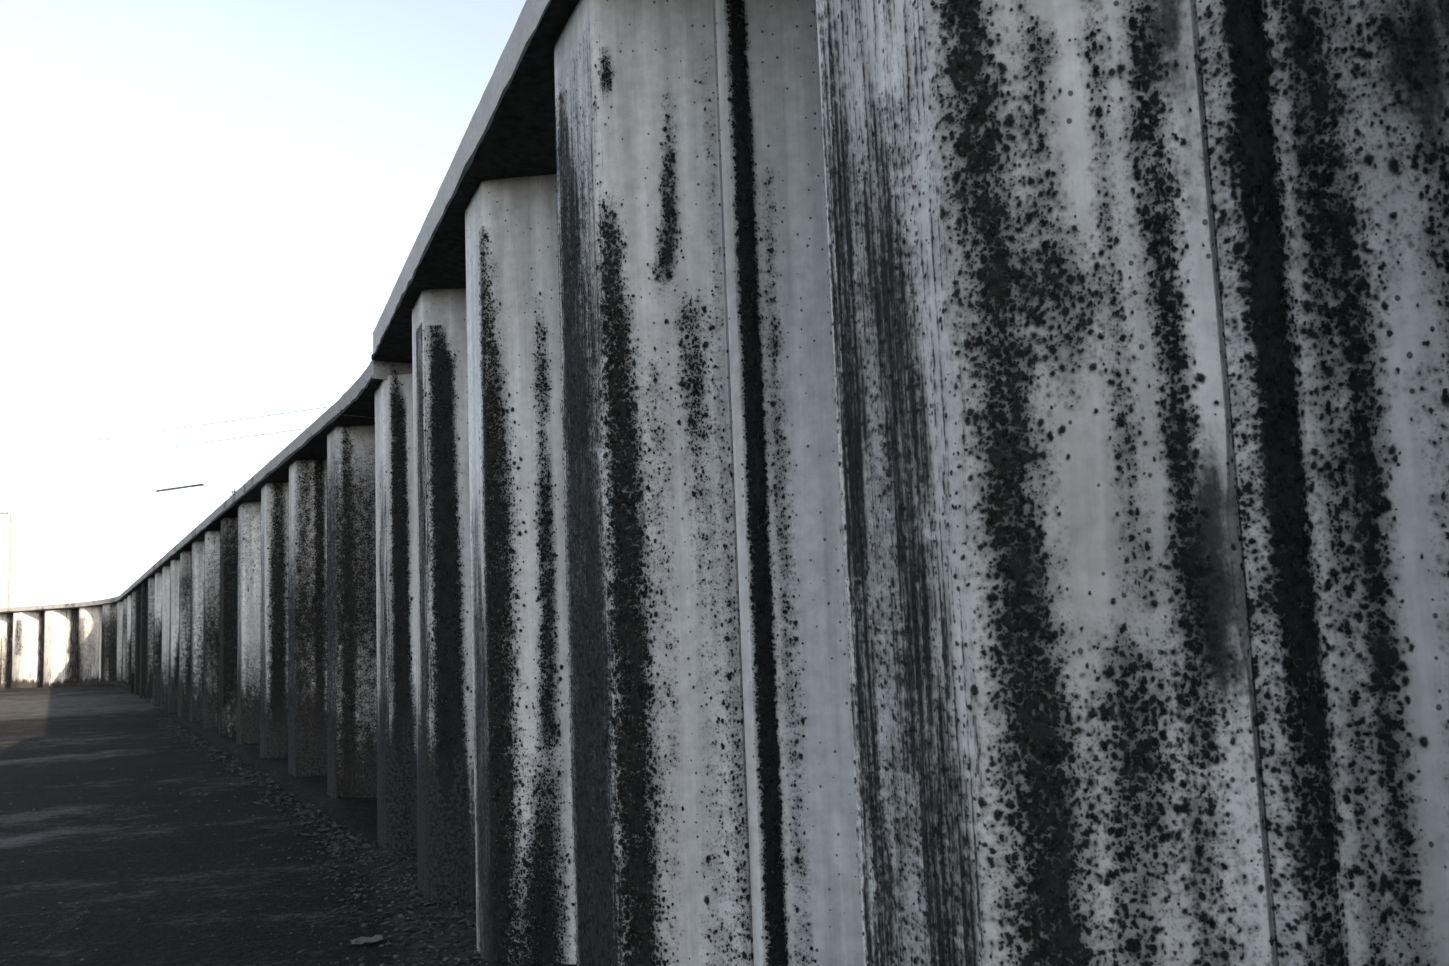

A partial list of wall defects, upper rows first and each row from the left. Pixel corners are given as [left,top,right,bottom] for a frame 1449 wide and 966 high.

damp [1148,0,1197,90]
damp [1369,0,1449,150]
damp [1188,448,1245,697]